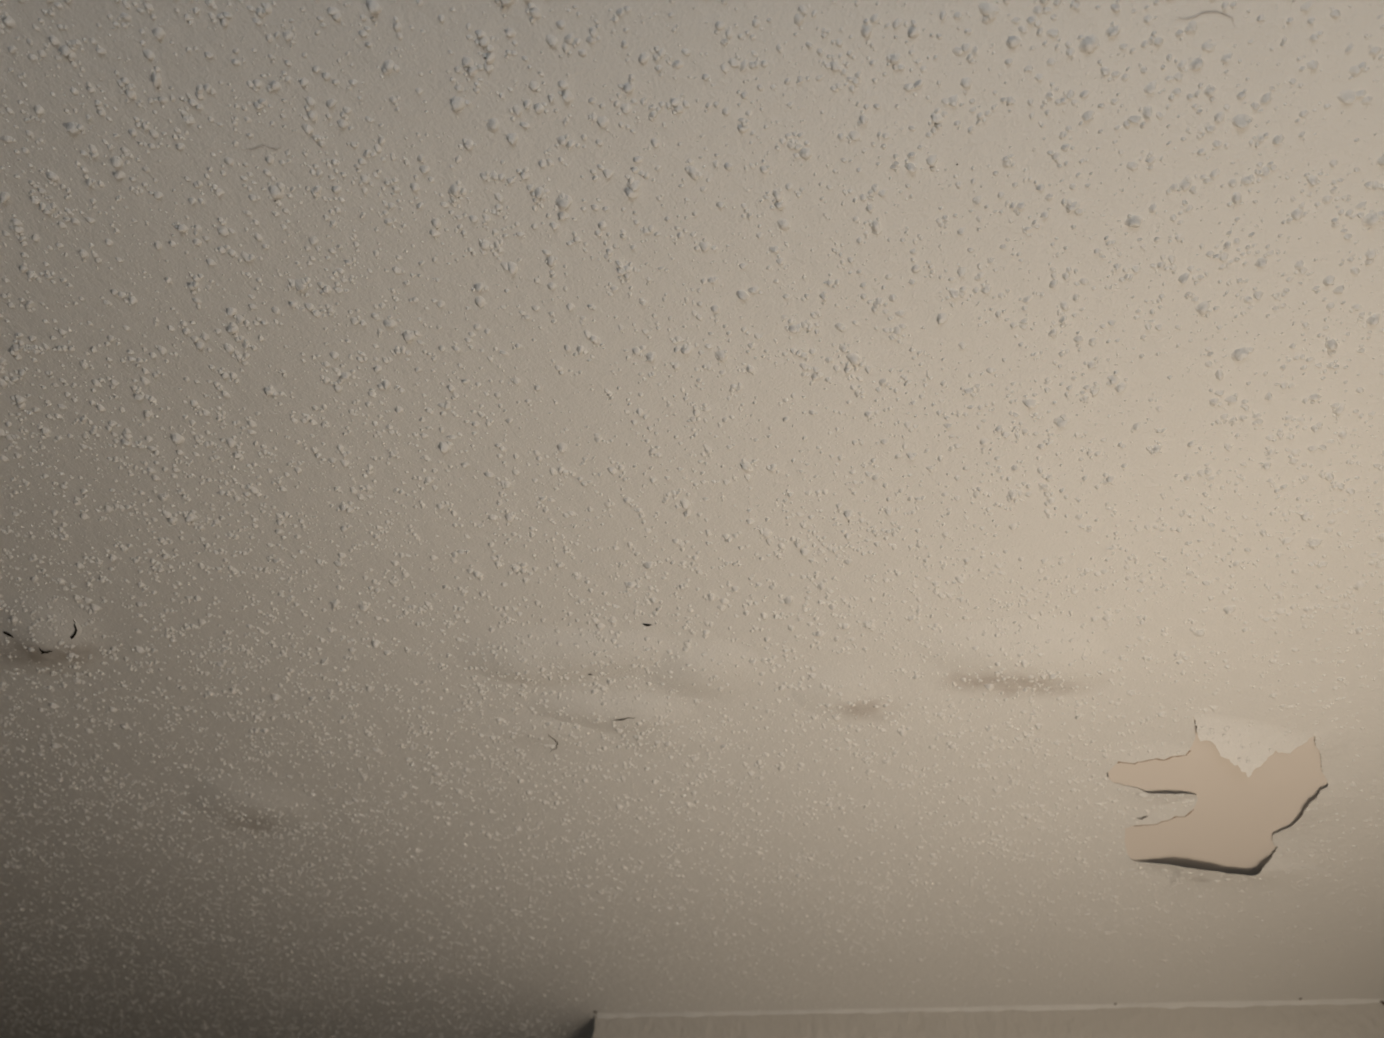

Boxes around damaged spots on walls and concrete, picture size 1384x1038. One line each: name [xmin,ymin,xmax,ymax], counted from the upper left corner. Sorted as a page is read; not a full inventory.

peeling [1102,714,1364,899]